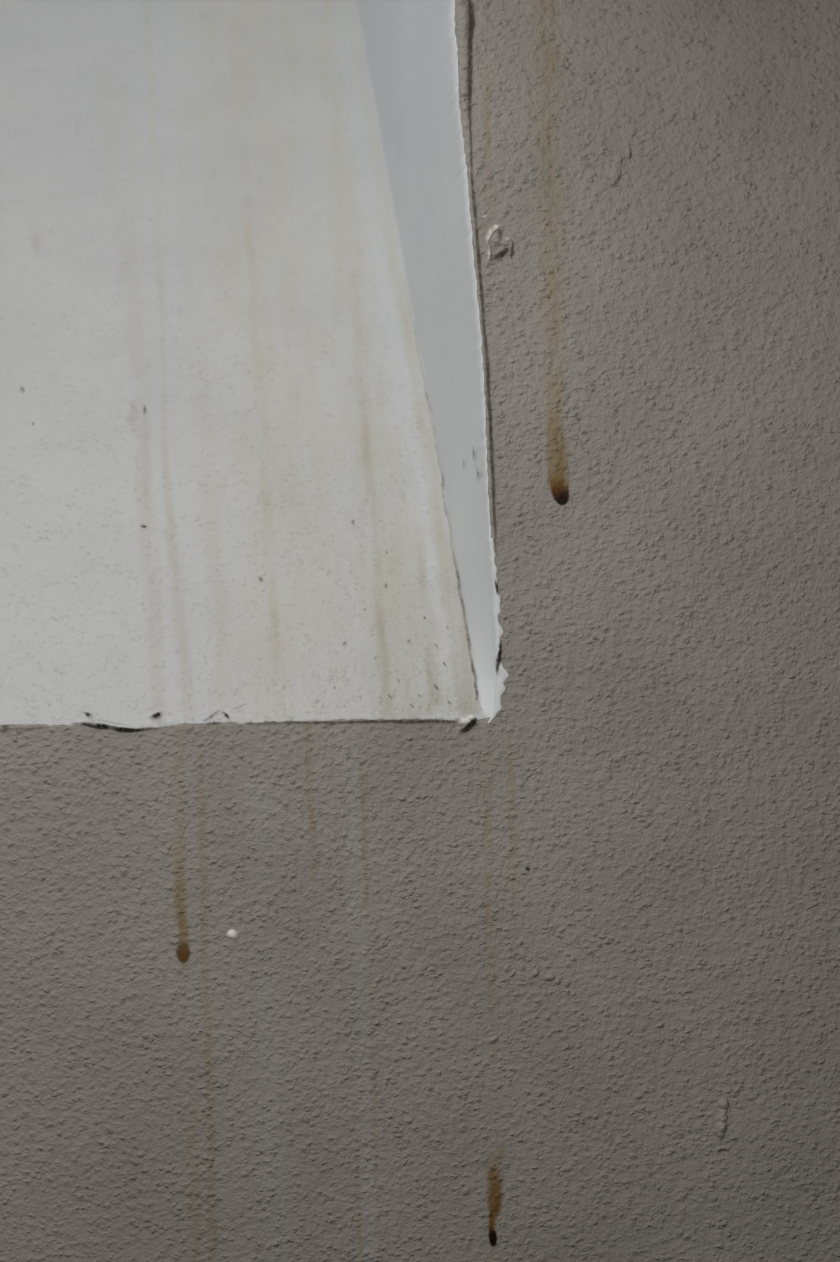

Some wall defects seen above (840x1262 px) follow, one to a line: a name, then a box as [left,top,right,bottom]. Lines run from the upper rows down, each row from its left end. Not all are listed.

corrosion [552,488,569,505]
corrosion [177,944,190,962]
corrosion [489,1226,497,1246]